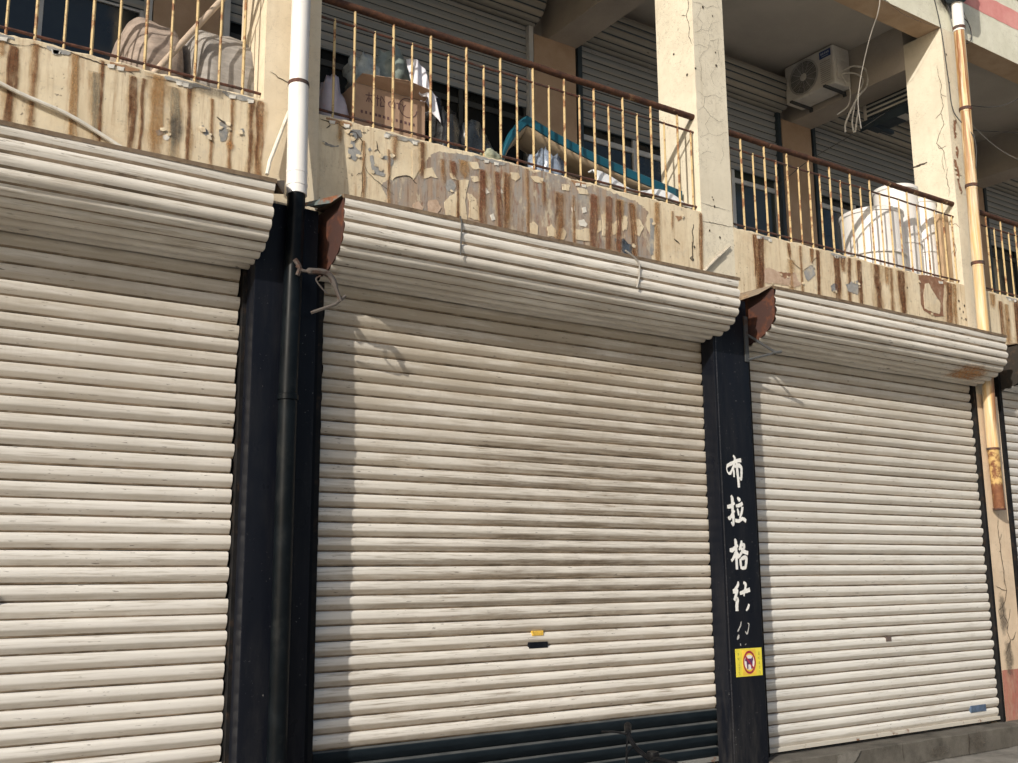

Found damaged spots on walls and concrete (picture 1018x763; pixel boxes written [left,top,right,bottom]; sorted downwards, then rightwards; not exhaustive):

corrosion [3,45,18,122]
corrosion [127,76,163,150]
corrosion [248,101,263,175]
crack [682,2,724,161]
crack [911,69,949,197]
peeling [322,117,656,259]
corrosion [590,194,638,256]
corrosion [753,234,764,289]
corrosion [787,243,821,295]
corrosion [834,255,863,304]
corrosion [874,264,906,313]
crack [997,531,1016,656]